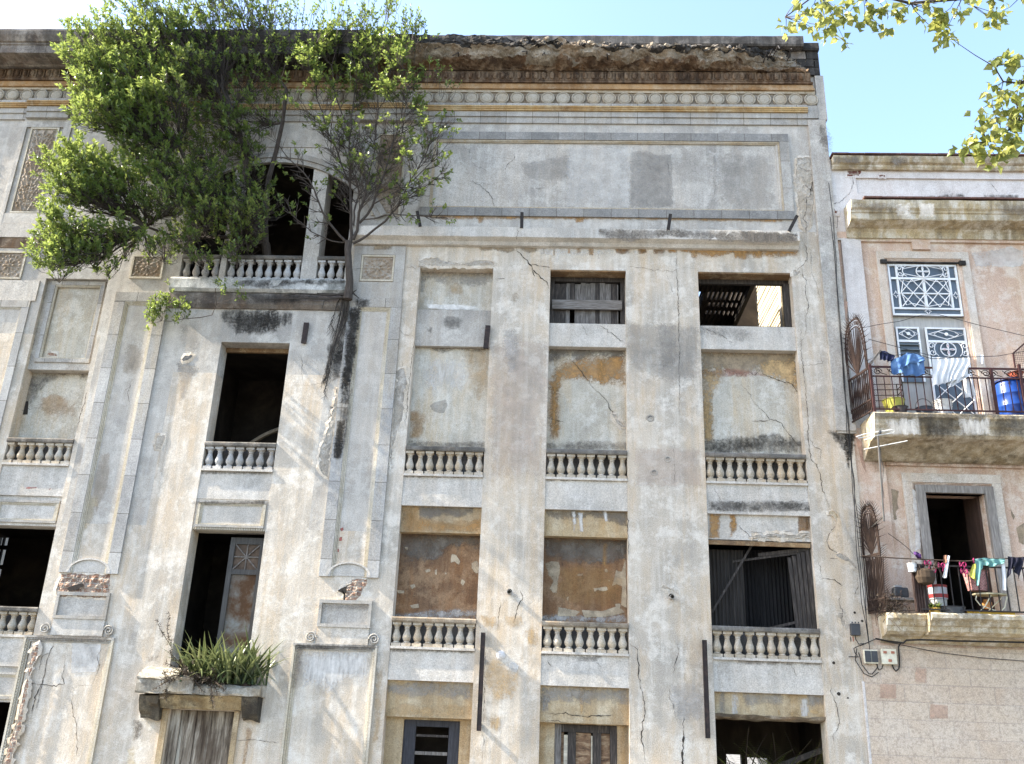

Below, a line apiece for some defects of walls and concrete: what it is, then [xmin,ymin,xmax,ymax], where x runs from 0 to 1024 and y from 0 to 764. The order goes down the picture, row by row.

crack [467,151,549,288]
water stain [223,280,344,333]
water stain [325,300,367,458]
crack [746,168,859,622]
water stain [706,435,802,453]
spalling [53,572,114,601]
spalling [336,576,370,605]
peeling [425,554,479,575]
peeling [545,561,627,618]
spalling [3,640,43,764]
crack [630,644,685,764]